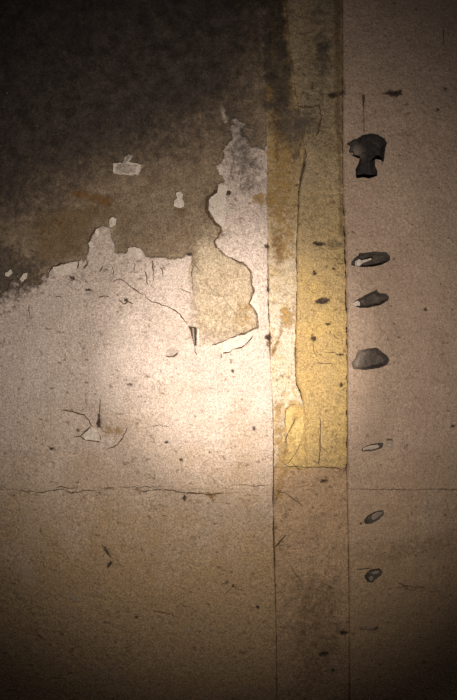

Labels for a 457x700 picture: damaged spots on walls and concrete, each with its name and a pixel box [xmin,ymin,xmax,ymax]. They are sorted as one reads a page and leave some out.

damp [265,0,323,145]
damp [318,0,345,154]
flaking render [0,0,267,355]
spalling [347,133,387,178]
damp [0,207,113,303]
spalling [351,251,390,267]
spalling [337,277,389,461]
crack [1,417,345,507]
spalling [360,510,385,524]
spalling [356,568,383,583]